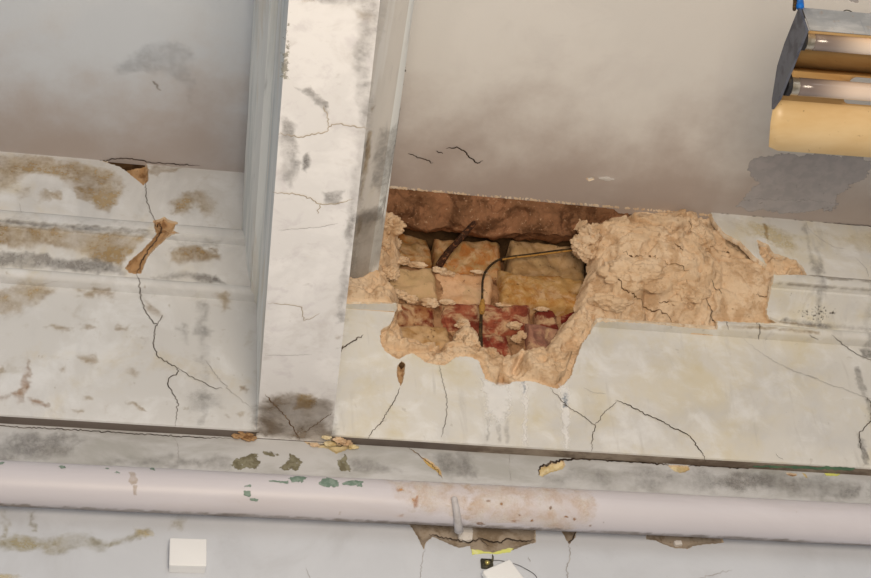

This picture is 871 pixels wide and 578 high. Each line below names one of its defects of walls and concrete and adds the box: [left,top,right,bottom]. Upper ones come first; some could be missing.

leakage [3,161,119,208]
crack [382,107,480,221]
leakage [0,226,133,271]
spalling [125,217,178,274]
spalling [346,186,807,389]
crack [0,278,248,463]
crack [726,323,871,450]
leakage [260,397,332,439]
crack [538,388,749,474]
peeling [269,476,307,484]
peeling [319,477,363,487]
spalling [409,524,536,555]